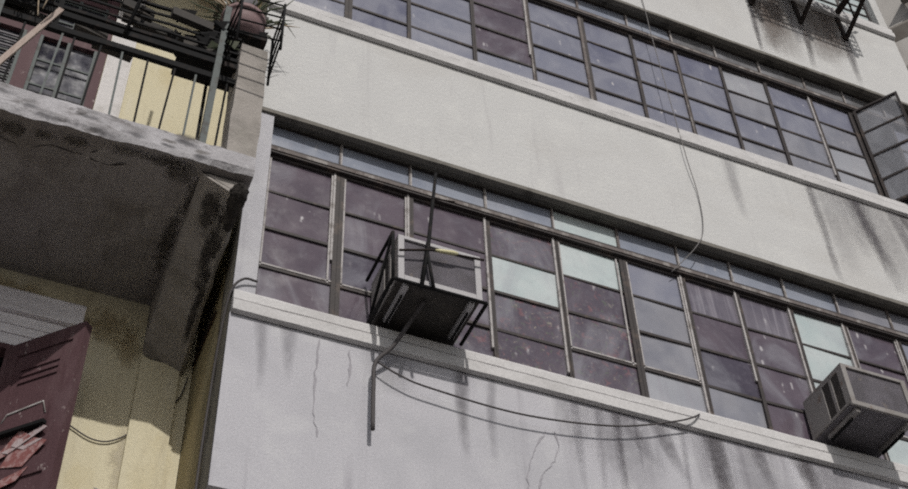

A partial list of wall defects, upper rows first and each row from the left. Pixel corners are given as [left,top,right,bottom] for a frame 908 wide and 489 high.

leakage [750,0,788,36]
leakage [797,4,854,61]
leakage [156,183,197,269]
crack [312,339,320,437]
crack [345,350,353,386]
crack [526,430,560,489]
leakage [708,435,726,480]